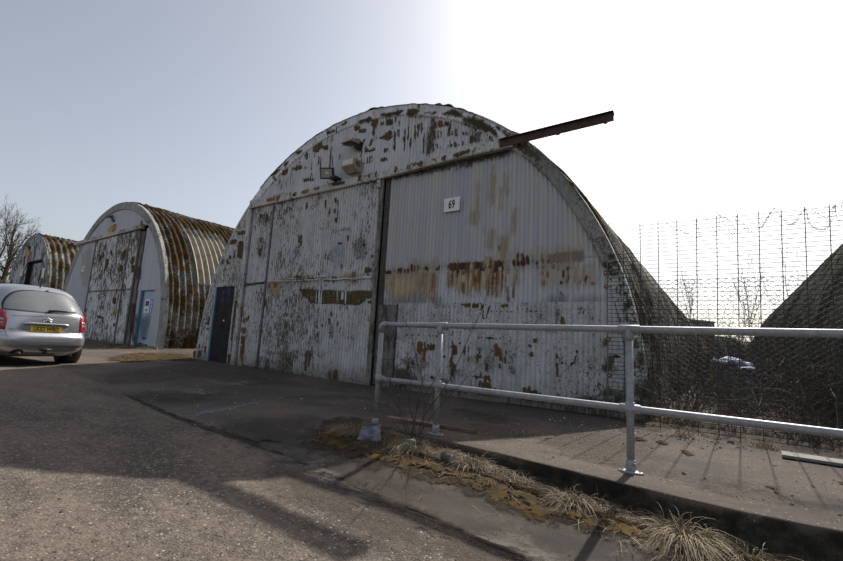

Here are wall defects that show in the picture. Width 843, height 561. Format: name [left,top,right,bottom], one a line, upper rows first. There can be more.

peeling [282,142,340,182]
peeling [354,116,423,164]
peeling [433,120,494,152]
peeling [99,245,134,272]
peeling [226,230,245,264]
peeling [317,194,373,260]
rust [385,239,594,302]
peeling [300,289,372,339]